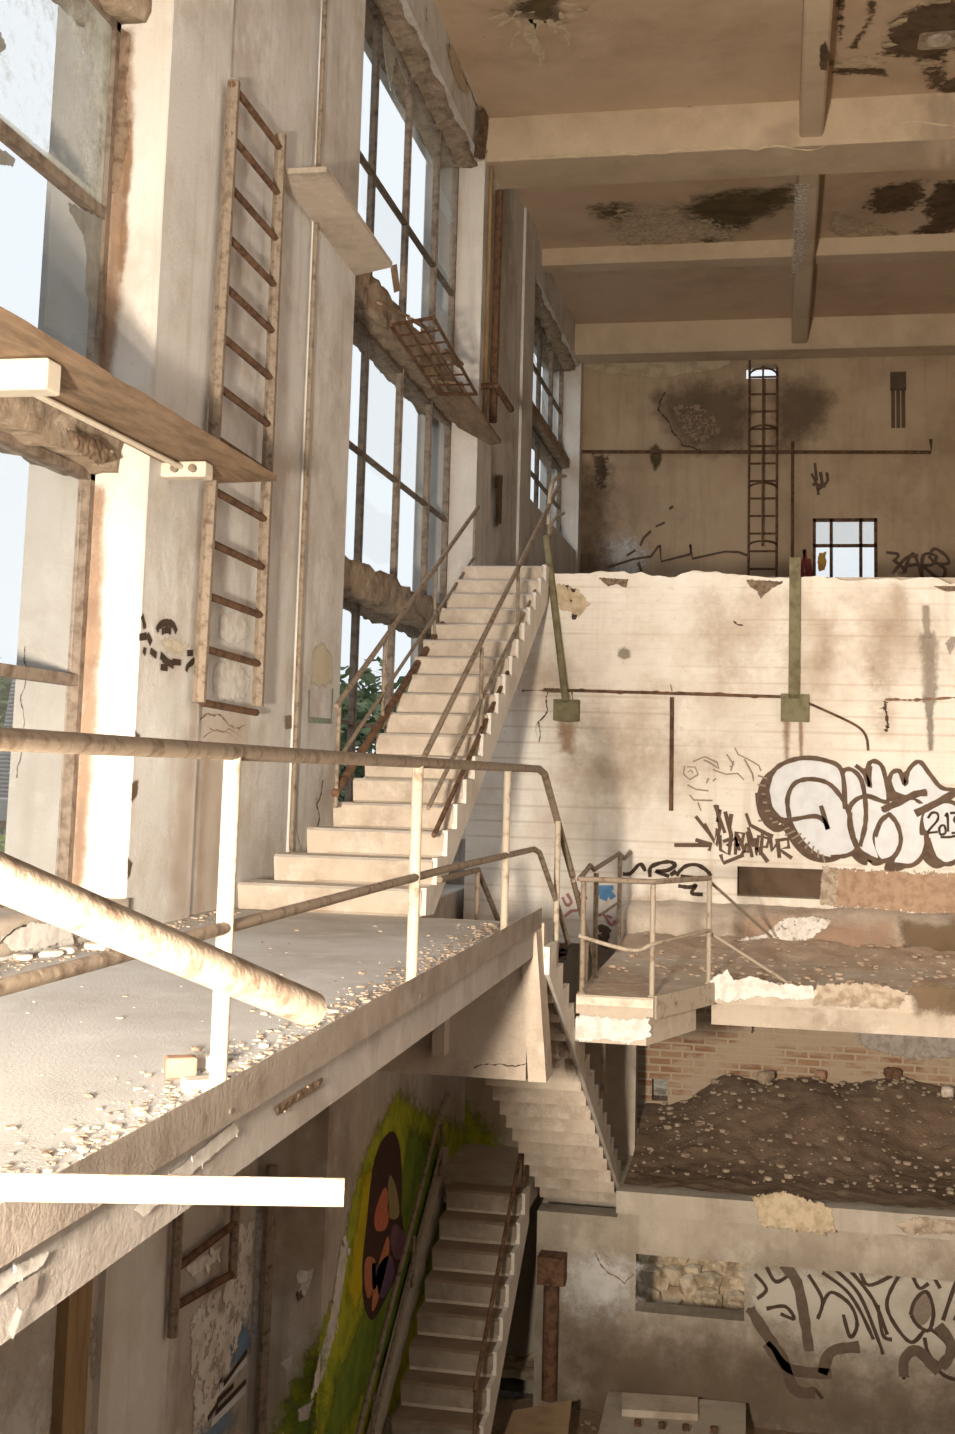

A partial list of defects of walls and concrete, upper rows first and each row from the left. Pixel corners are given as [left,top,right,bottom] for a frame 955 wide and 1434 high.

damp [480,0,589,69]
damp [833,0,955,93]
damp [685,187,795,243]
damp [863,180,955,235]
damp [666,387,746,450]
damp [780,386,828,439]
crack [0,924,27,944]